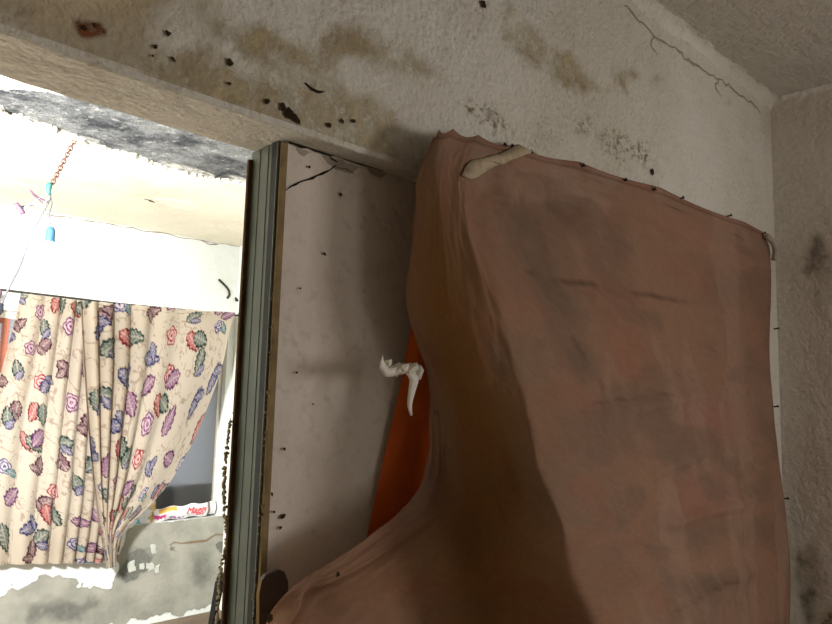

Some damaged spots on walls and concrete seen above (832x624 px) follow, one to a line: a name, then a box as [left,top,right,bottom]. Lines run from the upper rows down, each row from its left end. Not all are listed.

damp [0,0,161,60]
corrosion [75,21,106,37]
spalling [0,87,256,185]
damp [148,52,394,157]
damp [237,28,311,64]
crack [625,5,760,112]
peeling [0,412,233,624]